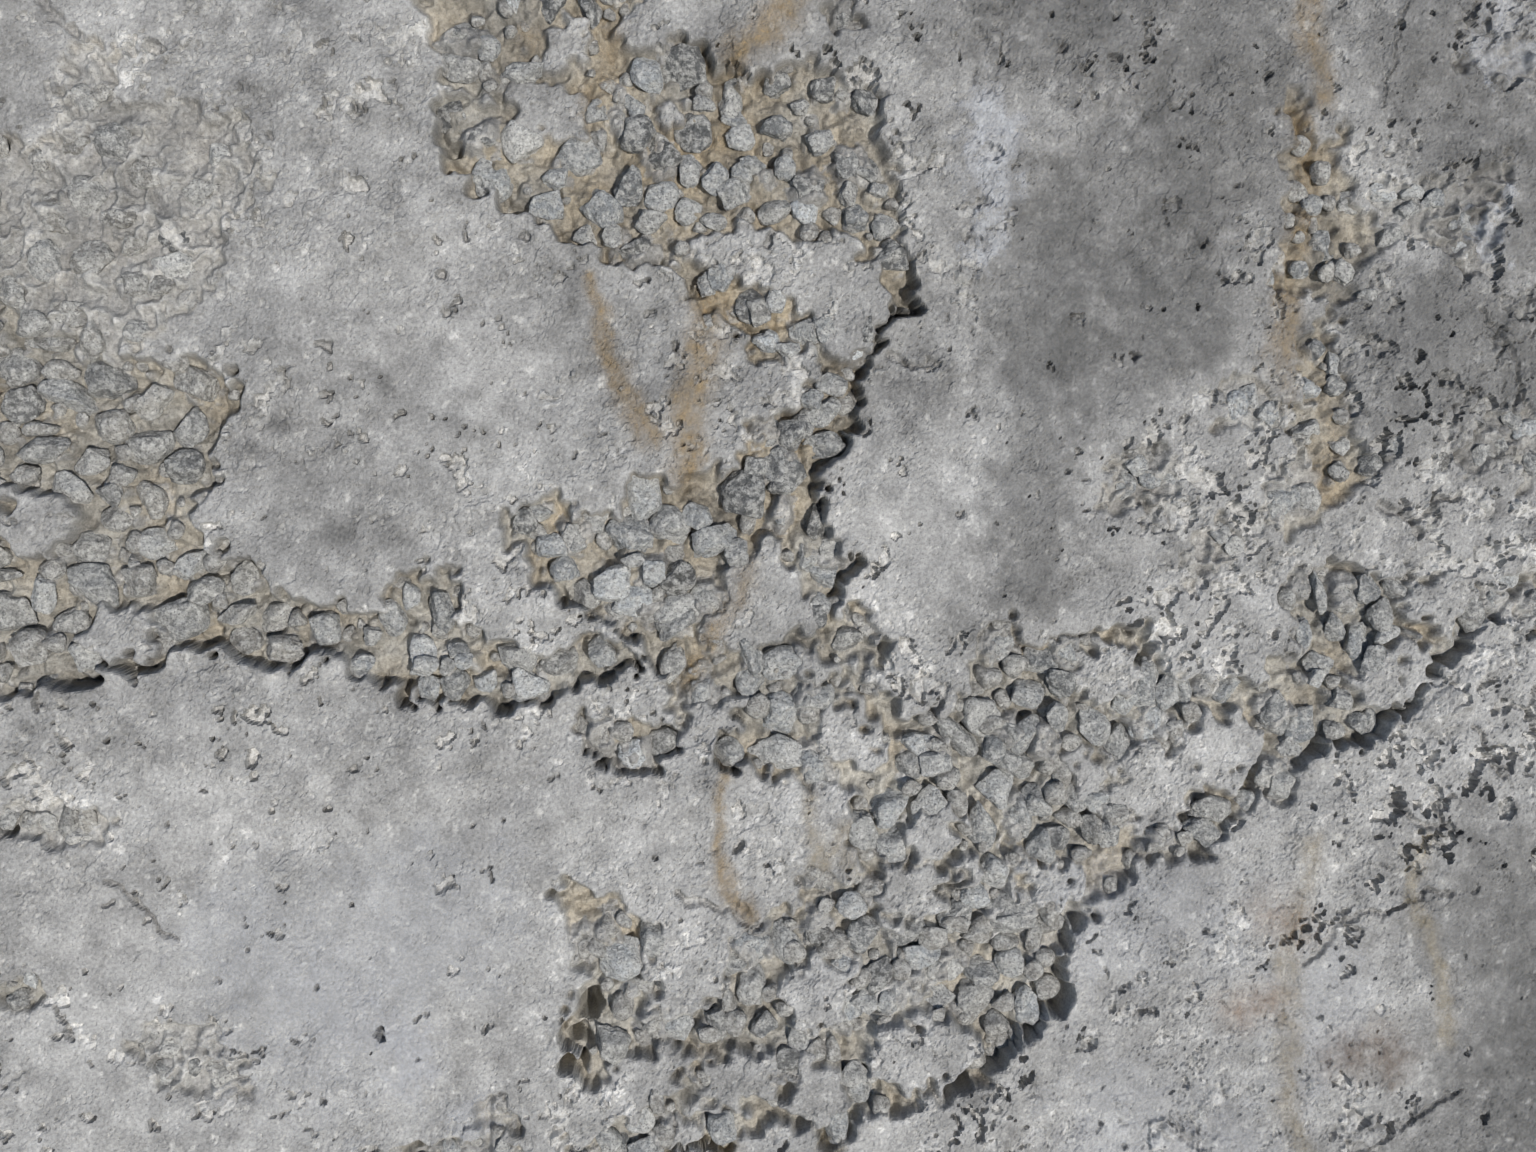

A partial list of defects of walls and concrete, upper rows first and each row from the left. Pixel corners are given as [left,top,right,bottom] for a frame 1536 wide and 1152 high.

peeling [480,9,603,169]
peeling [648,93,692,131]
peeling [0,483,88,566]
peeling [72,584,169,686]
peeling [661,695,751,752]
peeling [782,640,903,774]
peeling [1067,633,1145,711]
peeling [1054,705,1273,840]
peeling [1338,574,1536,711]
peeling [870,801,1002,937]
peeling [1007,851,1094,915]
peeling [586,947,985,1152]